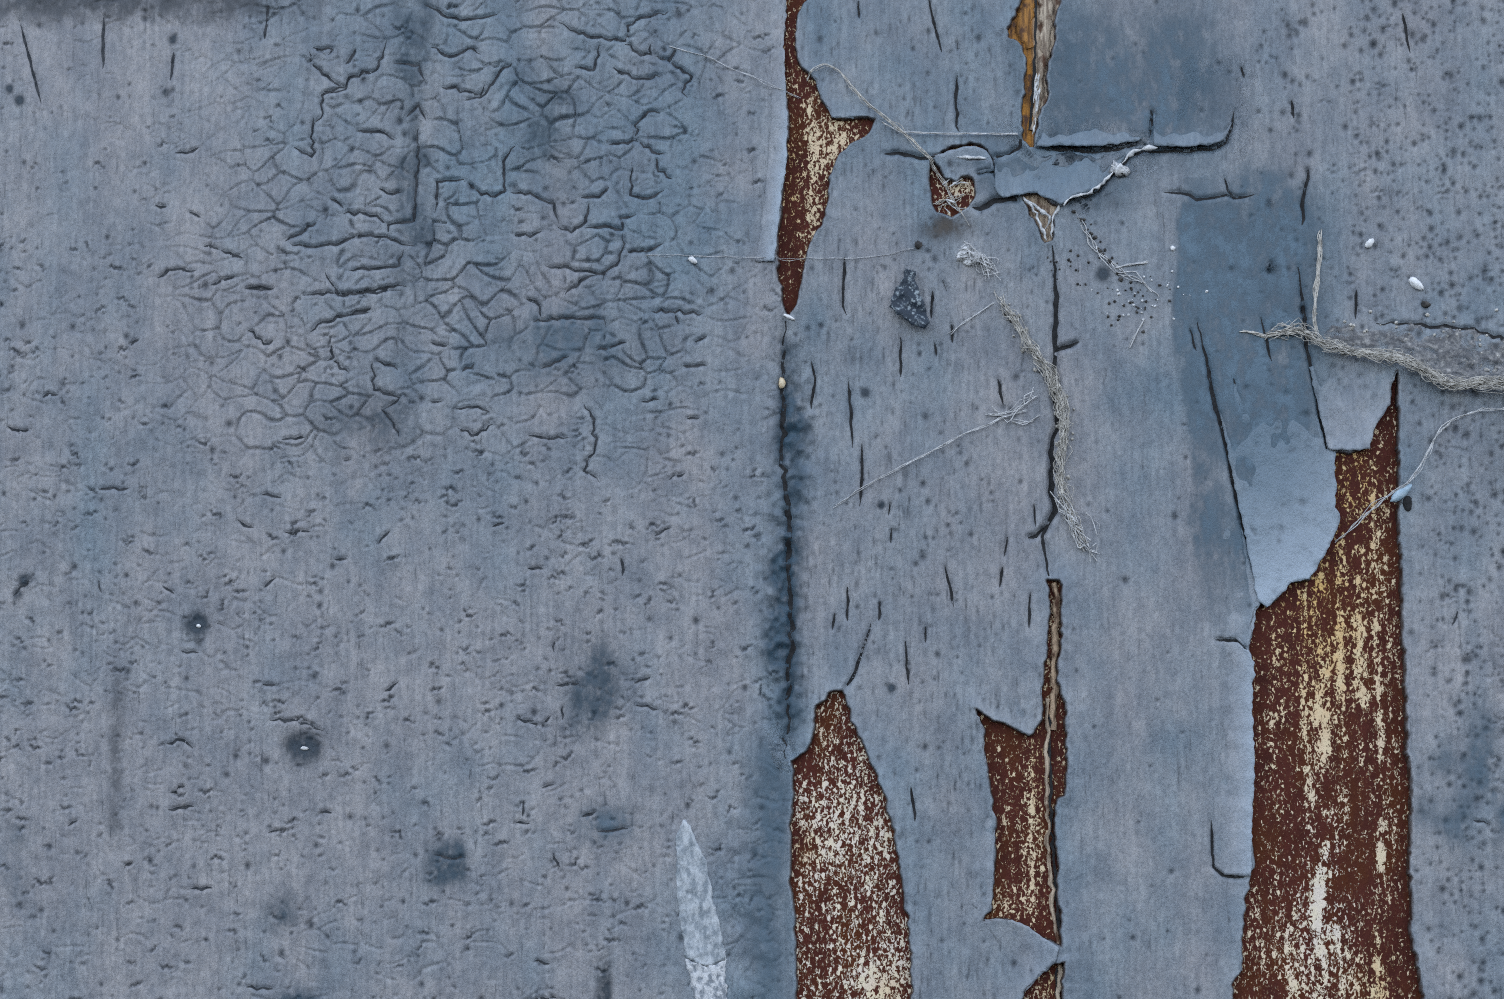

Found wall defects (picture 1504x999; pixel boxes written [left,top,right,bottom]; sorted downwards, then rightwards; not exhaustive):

crack [156,4,693,437]
peeling [755,0,874,314]
crack [779,321,892,759]
peeling [790,692,913,999]
crack [832,567,954,686]
crack [884,0,959,160]
peeling [971,581,1066,999]
crack [999,245,1079,626]
crack [972,0,1254,211]
crack [1190,322,1252,568]
crack [1260,267,1327,449]
peeling [1213,359,1421,999]